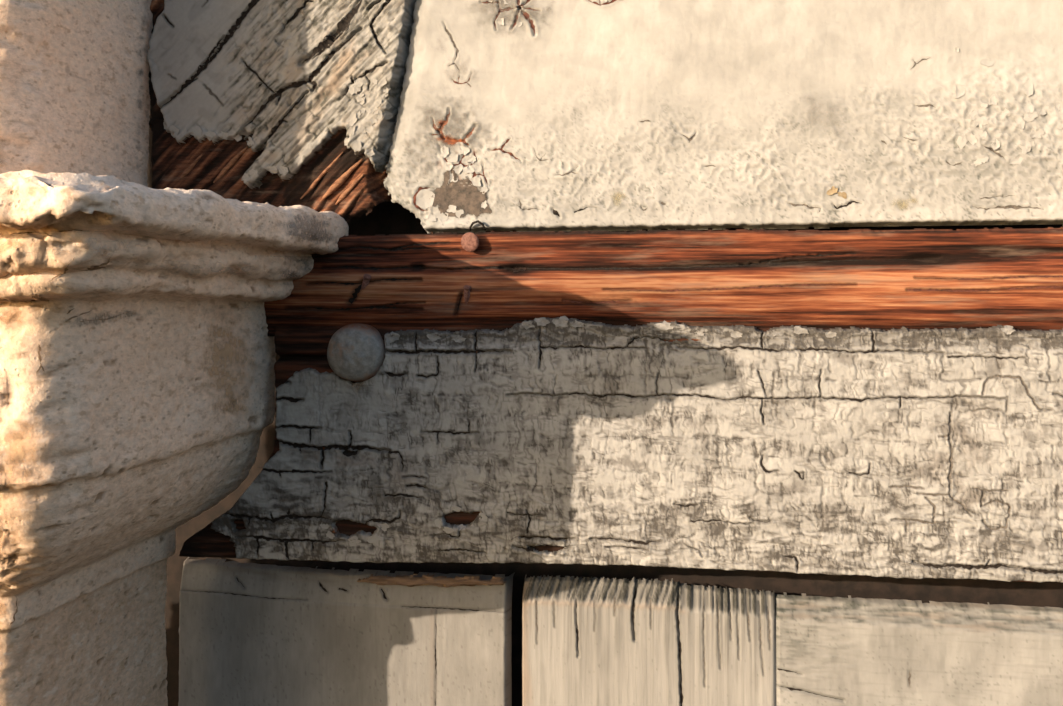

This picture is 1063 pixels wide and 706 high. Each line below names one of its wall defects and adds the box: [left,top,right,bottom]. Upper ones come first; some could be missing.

spalling [304,1,361,61]
crack [164,0,391,143]
peeling [344,78,397,156]
peeling [241,165,288,183]
peeling [427,145,492,222]
crack [387,331,505,378]
peeling [521,316,584,330]
peeling [655,320,705,336]
crack [513,327,1063,533]
crack [226,381,426,559]
crack [507,510,660,552]
crack [913,561,1063,574]